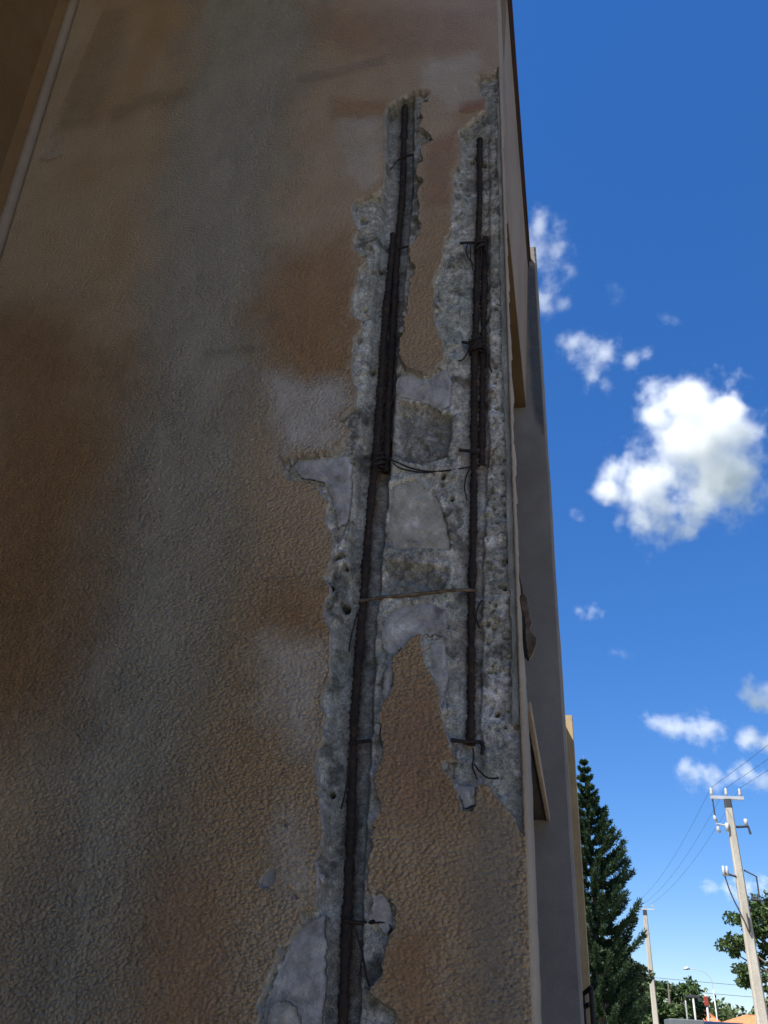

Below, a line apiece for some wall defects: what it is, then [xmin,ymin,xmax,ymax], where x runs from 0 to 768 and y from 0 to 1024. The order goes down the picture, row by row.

spalling [255,66,536,1024]